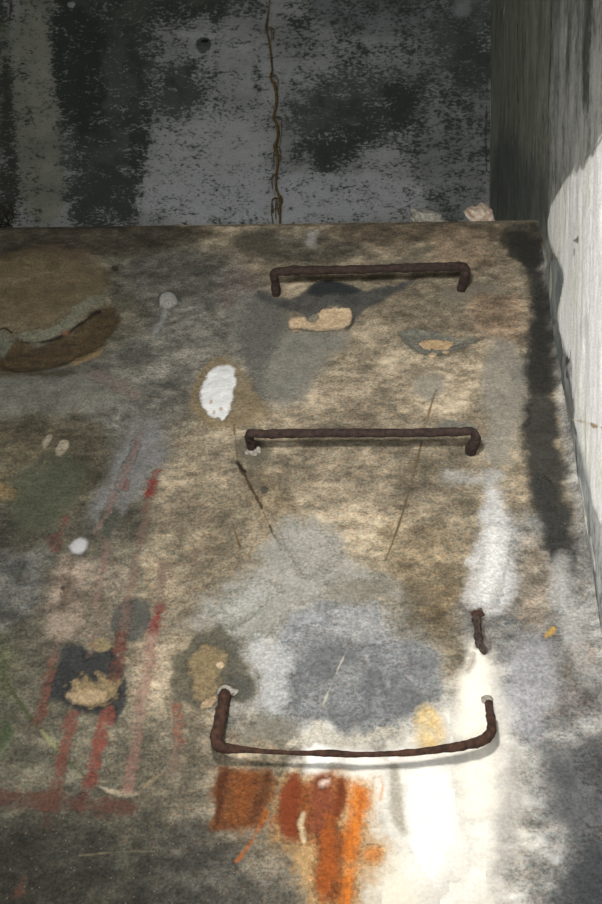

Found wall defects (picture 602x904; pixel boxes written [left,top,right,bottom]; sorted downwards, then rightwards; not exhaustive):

leakage [0,55,29,228]
leakage [36,0,266,227]
leakage [275,0,491,172]
flaking render [0,303,124,379]
spalling [287,306,354,333]
leakage [220,240,441,417]
spalling [396,327,482,358]
leakage [433,100,600,683]
spalling [39,604,131,724]
spalling [167,623,264,719]
rust [408,700,451,759]
rust [205,759,404,904]